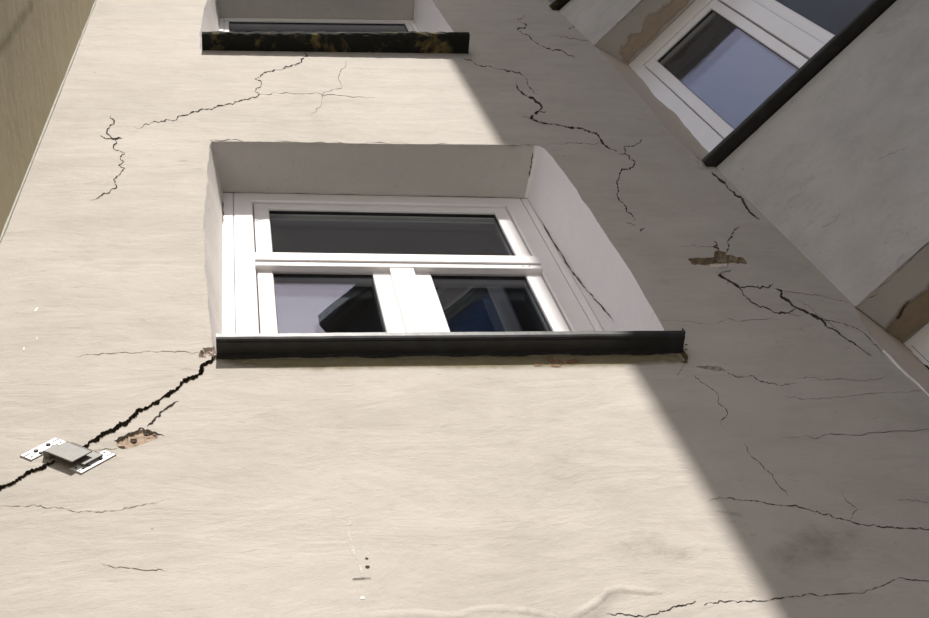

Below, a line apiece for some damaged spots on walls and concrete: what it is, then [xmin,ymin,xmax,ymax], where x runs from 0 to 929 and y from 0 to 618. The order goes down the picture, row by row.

peeling [620,0,689,62]
crack [90,52,350,201]
crack [463,58,644,232]
spalling [688,250,747,275]
crack [660,173,929,428]
spalling [116,430,158,449]
crack [83,351,218,450]
crack [0,460,163,513]
crack [710,443,929,530]
crack [606,577,929,617]